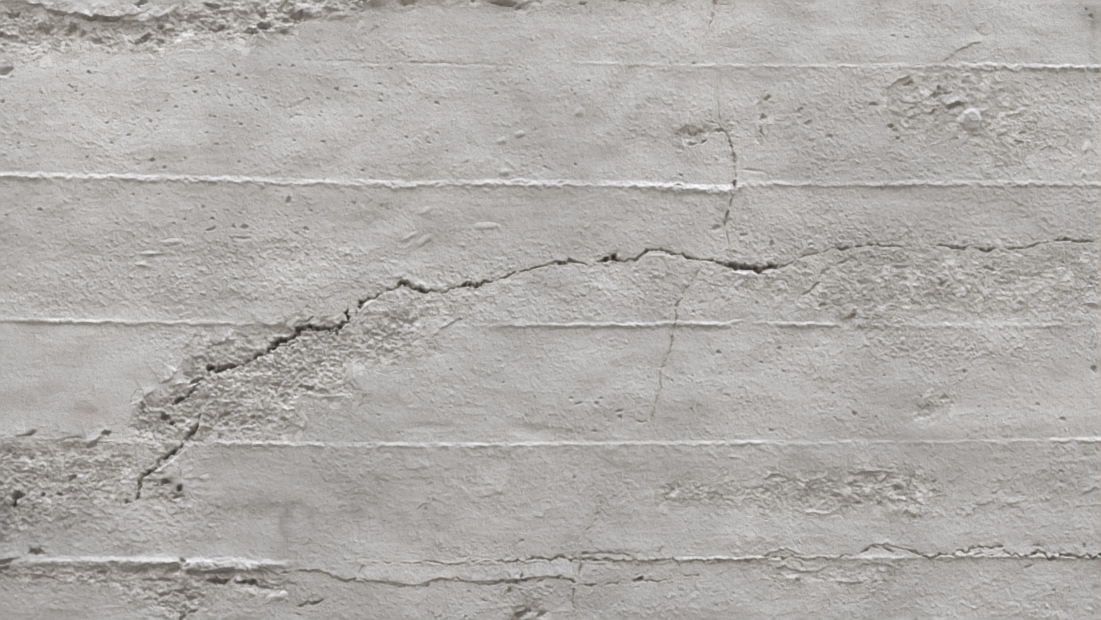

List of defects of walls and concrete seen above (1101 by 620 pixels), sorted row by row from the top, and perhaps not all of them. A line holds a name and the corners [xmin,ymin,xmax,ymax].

spalling [0,0,607,68]
crack [119,0,1101,510]
spalling [0,295,474,620]
crack [255,492,1101,620]